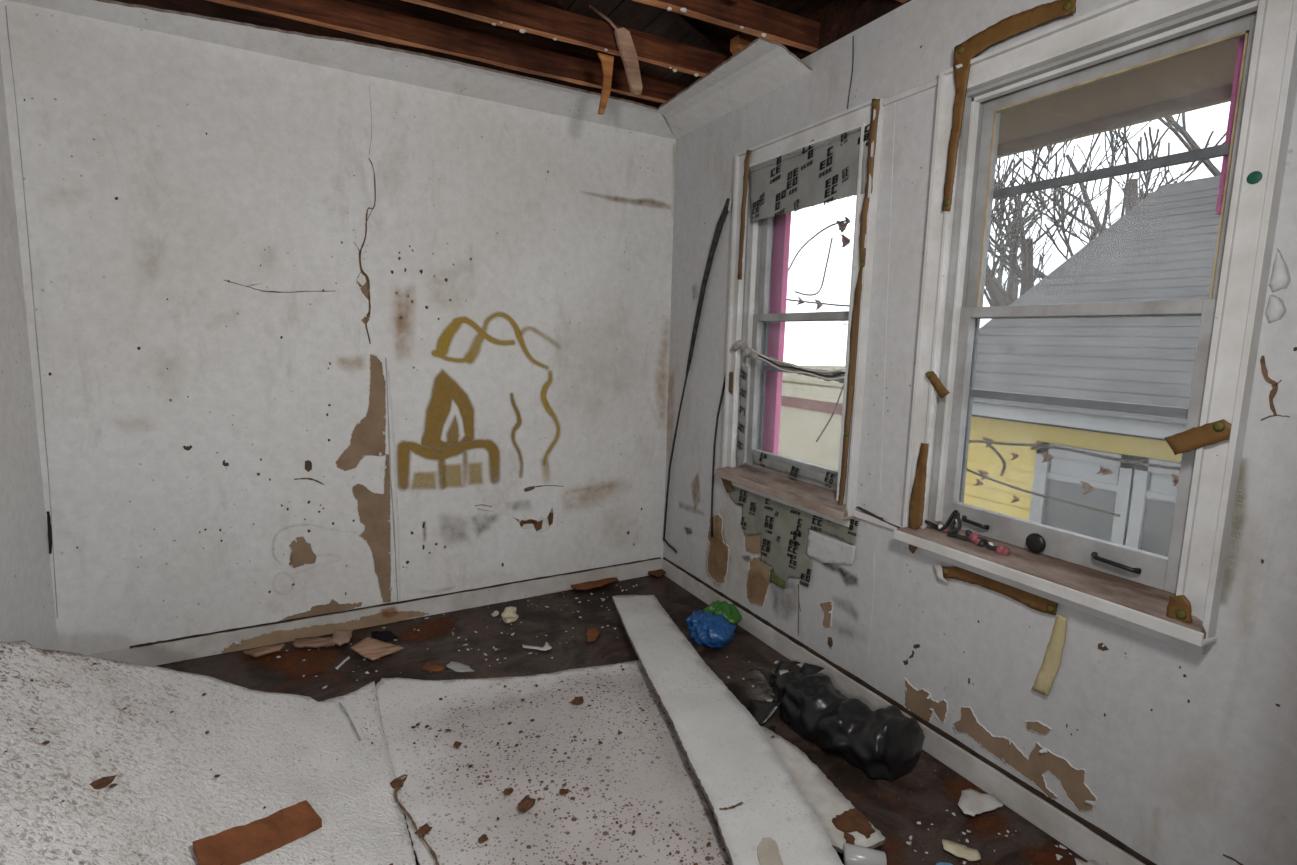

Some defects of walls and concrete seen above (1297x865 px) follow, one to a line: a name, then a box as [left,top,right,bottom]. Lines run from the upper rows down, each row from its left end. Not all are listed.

crack [224,158,376,344]
crack [1260,356,1289,421]
peeling [335,354,393,603]
peeling [289,536,317,569]
peeling [707,513,771,608]
peeling [276,598,362,622]
peeling [903,644,1098,812]